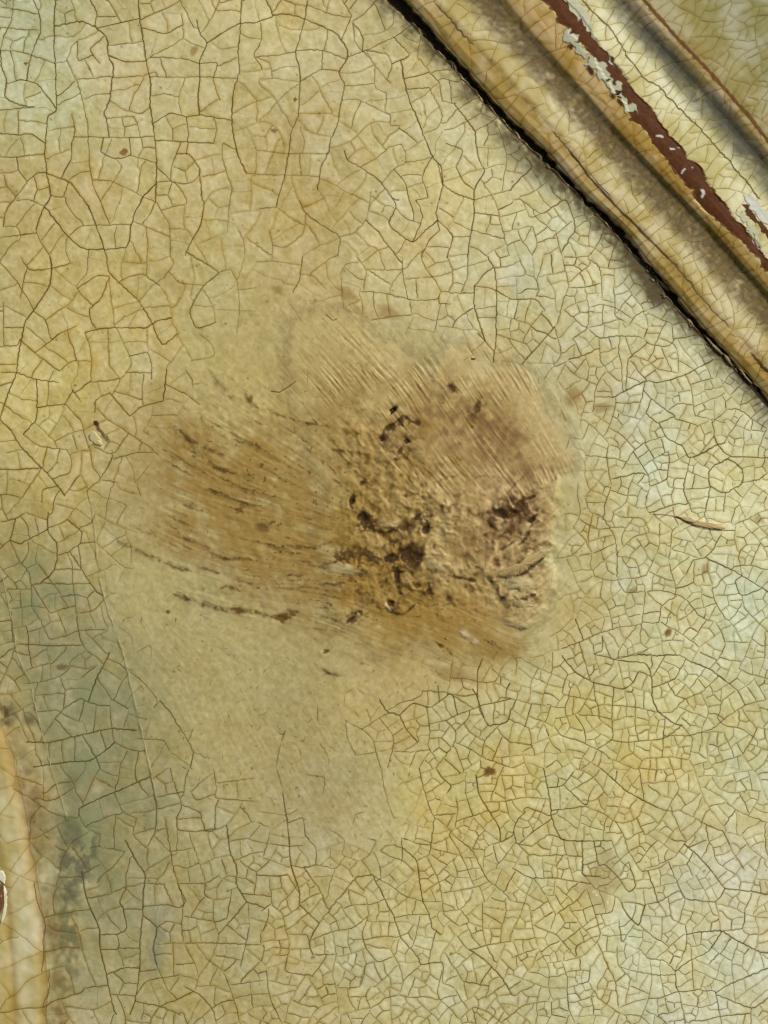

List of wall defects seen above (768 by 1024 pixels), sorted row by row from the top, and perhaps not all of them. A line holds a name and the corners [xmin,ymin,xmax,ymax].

peeling [542,0,768,271]
crack [0,0,768,511]
crack [0,257,129,596]
damp [168,438,507,655]
crack [706,551,768,595]
crack [29,652,137,768]
crack [79,776,151,810]
crack [81,840,192,1015]
crack [215,793,319,955]
crack [343,804,442,965]
crack [379,659,768,1023]
crack [562,619,745,741]